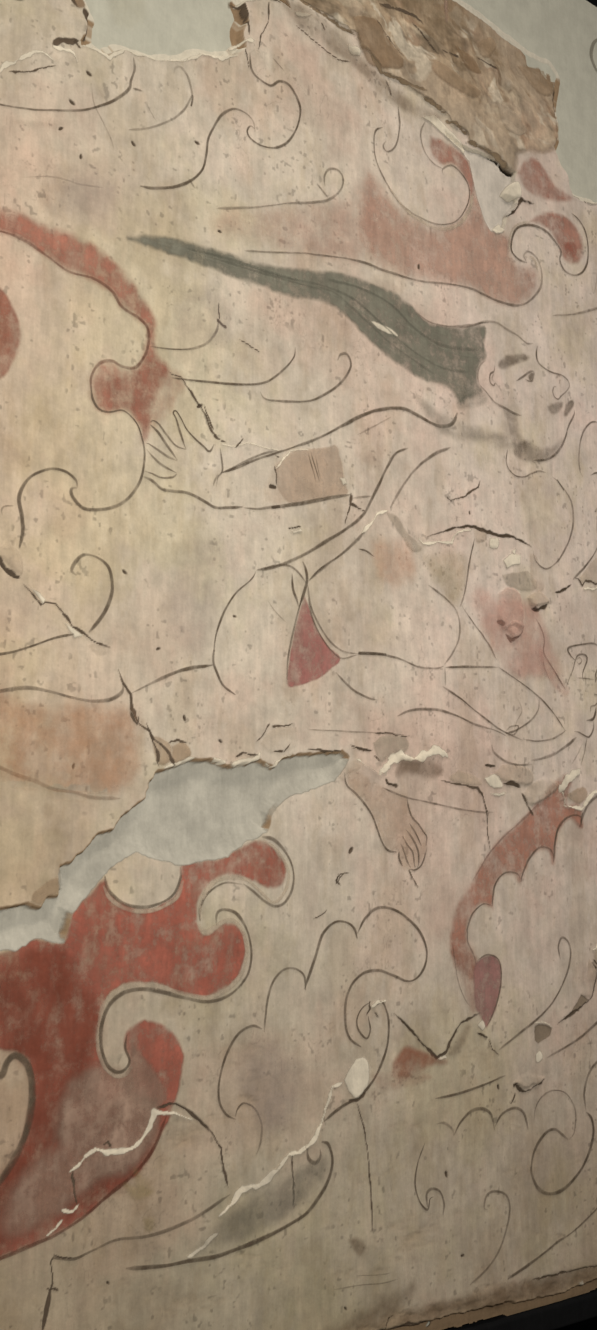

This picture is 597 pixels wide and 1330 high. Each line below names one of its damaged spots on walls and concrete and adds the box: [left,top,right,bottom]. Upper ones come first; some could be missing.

crack [295,0,507,168]
crack [418,483,529,548]
crack [0,557,191,764]
flaking render [0,724,348,951]
spalling [305,1057,369,1150]
crack [397,1014,498,1060]
crack [42,1103,308,1330]